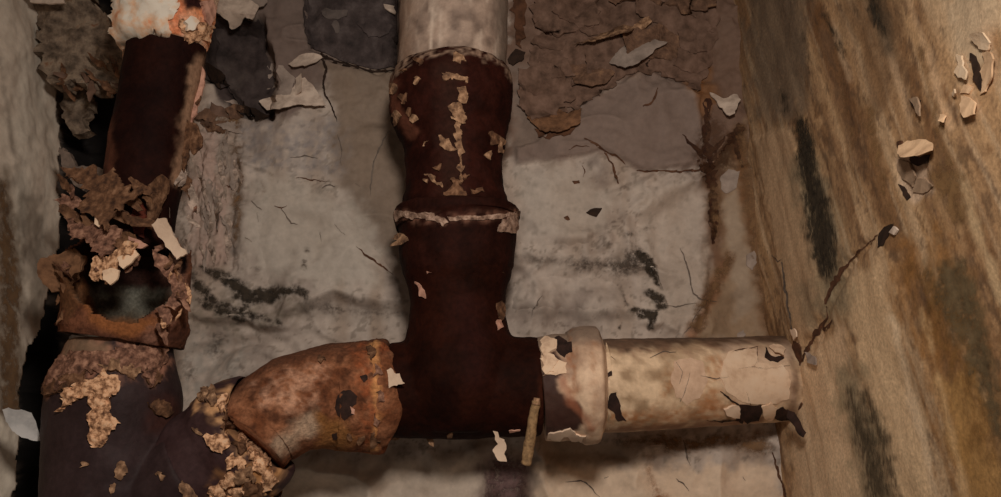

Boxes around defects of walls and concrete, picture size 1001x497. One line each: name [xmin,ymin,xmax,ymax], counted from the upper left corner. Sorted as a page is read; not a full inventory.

spalling [30,0,122,140]
spalling [508,0,741,139]
peeling [952,32,994,118]
spalling [58,147,103,192]
spalling [182,0,398,274]
water stain [796,115,837,279]
peeling [896,139,933,200]
water stain [191,265,306,324]
water stain [605,250,667,330]
crack [650,235,877,423]
water stain [846,388,897,497]